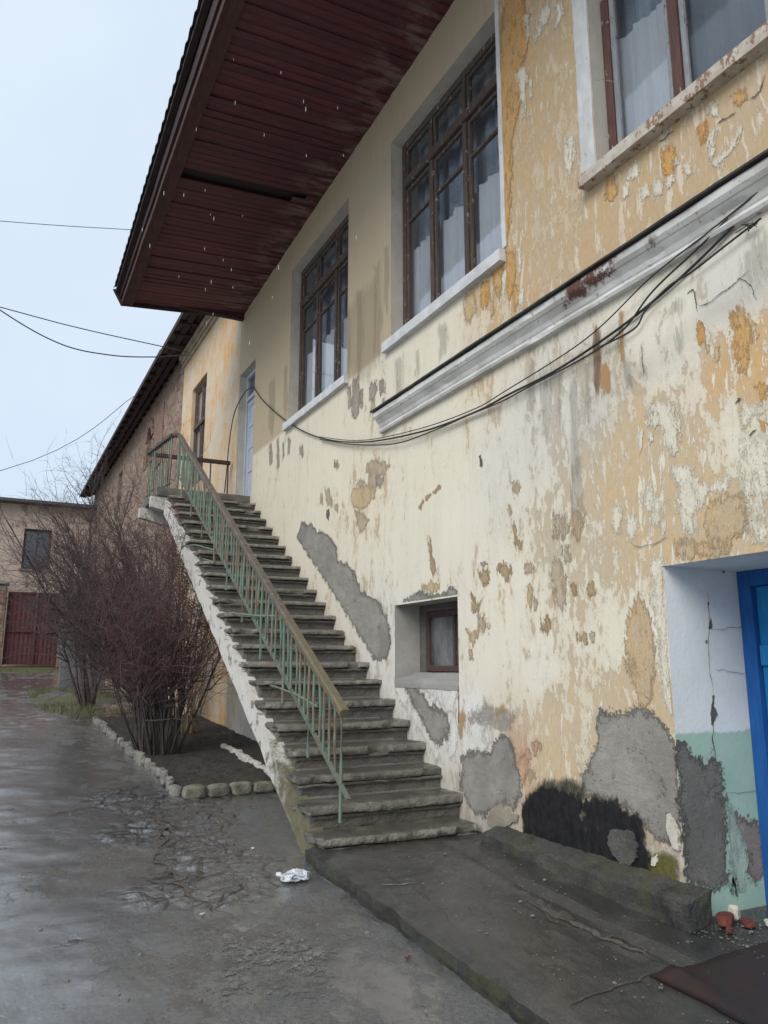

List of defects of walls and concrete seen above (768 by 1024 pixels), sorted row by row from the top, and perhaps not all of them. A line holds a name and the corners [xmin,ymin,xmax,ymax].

peeling [696,86,748,170]
peeling [603,141,694,206]
corrosion [563,256,618,307]
crack [687,271,757,309]
peeling [350,459,390,533]
spalling [297,489,392,662]
peeling [402,503,597,660]
spalling [580,305,768,898]
crack [708,597,746,686]
spalling [395,683,542,828]
leakage [521,777,652,872]